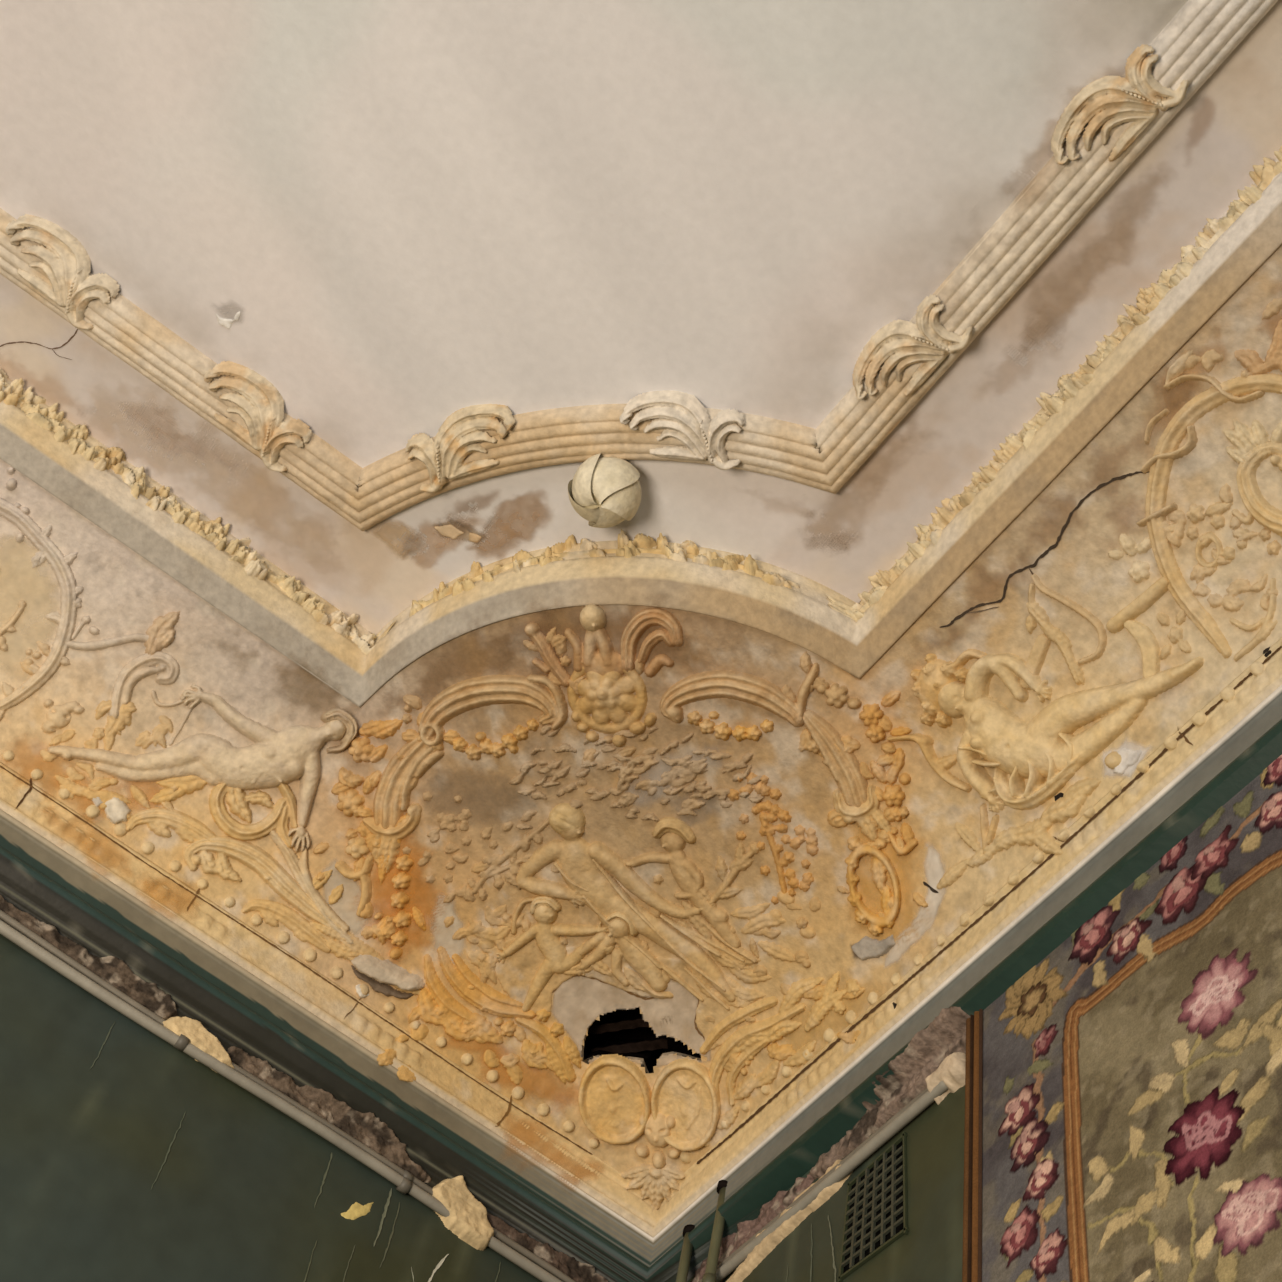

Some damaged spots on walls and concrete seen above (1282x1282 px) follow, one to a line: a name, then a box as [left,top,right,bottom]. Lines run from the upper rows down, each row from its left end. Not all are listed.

damp [476,498,543,553]
crack [940,471,1148,628]
flaking render [0,895,178,1020]
flaking render [324,862,367,932]
peeling [351,954,425,999]
flaking render [433,896,463,963]
flaking render [552,975,710,1073]
flaking render [227,1046,431,1183]
flaking render [692,1006,970,1282]
flaking render [487,1214,608,1282]